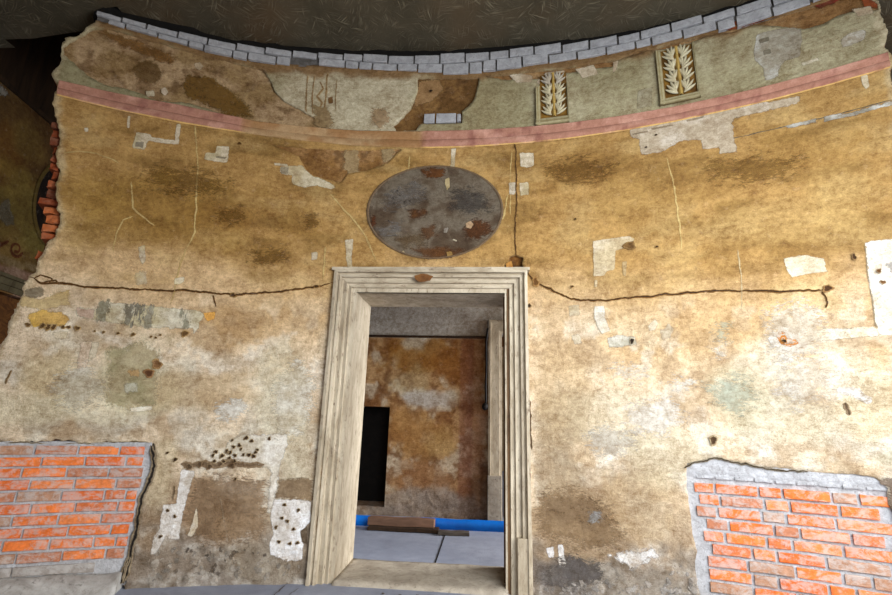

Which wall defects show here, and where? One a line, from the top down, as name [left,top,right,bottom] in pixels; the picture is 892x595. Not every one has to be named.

flaking render [394,79,479,131]
flaking render [35,122,60,262]
crack [512,144,520,252]
crack [30,274,333,306]
crack [527,272,835,308]
spalling [166,435,264,481]
flaking render [274,503,308,545]